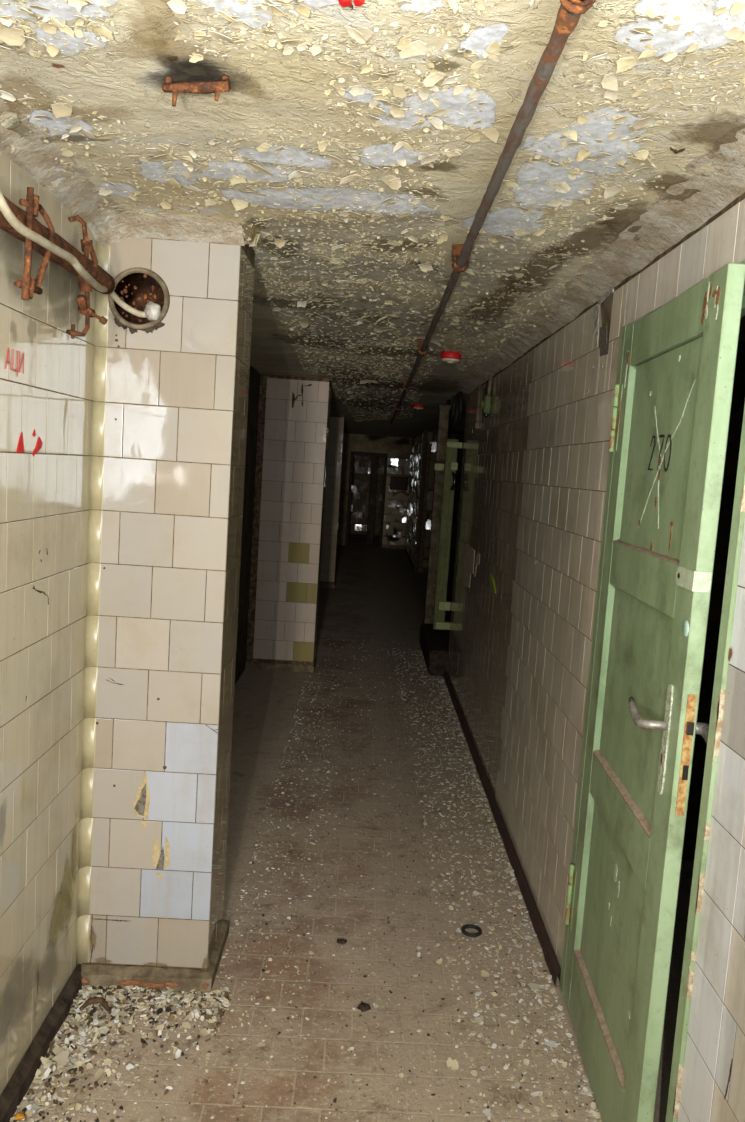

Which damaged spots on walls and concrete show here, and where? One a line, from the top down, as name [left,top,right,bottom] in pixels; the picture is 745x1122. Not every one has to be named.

peeling [0,0,745,422]
spalling [133,773,150,830]
spalling [152,836,170,879]